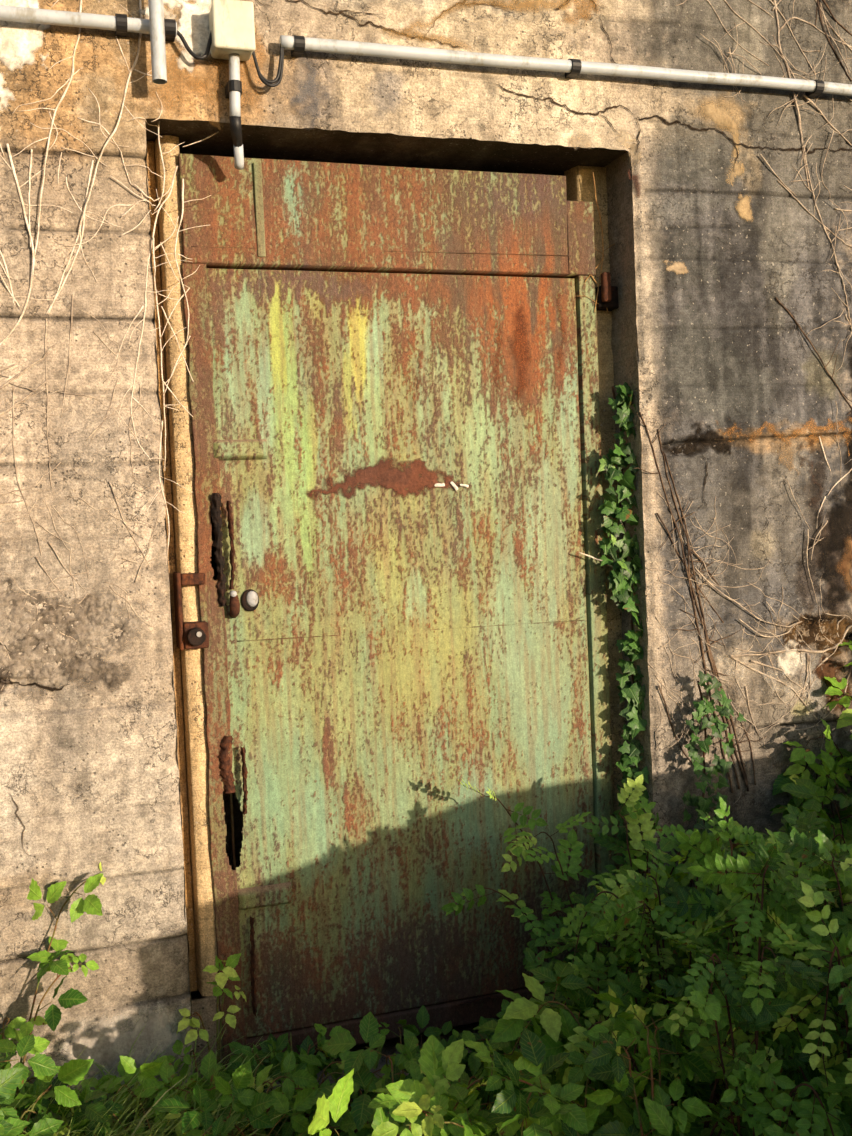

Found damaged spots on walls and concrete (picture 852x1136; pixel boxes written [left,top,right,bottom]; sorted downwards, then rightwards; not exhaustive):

efflorescence [0,0,39,9]
efflorescence [0,20,50,109]
leakage [163,0,212,71]
crack [257,0,501,47]
crack [496,84,852,172]
corrosion [496,306,530,397]
corrosion [307,459,471,500]
corrosion [211,493,236,606]
leakage [813,438,852,616]
crack [0,679,70,692]
corrosion [218,735,248,815]
corrosion [249,916,257,1016]